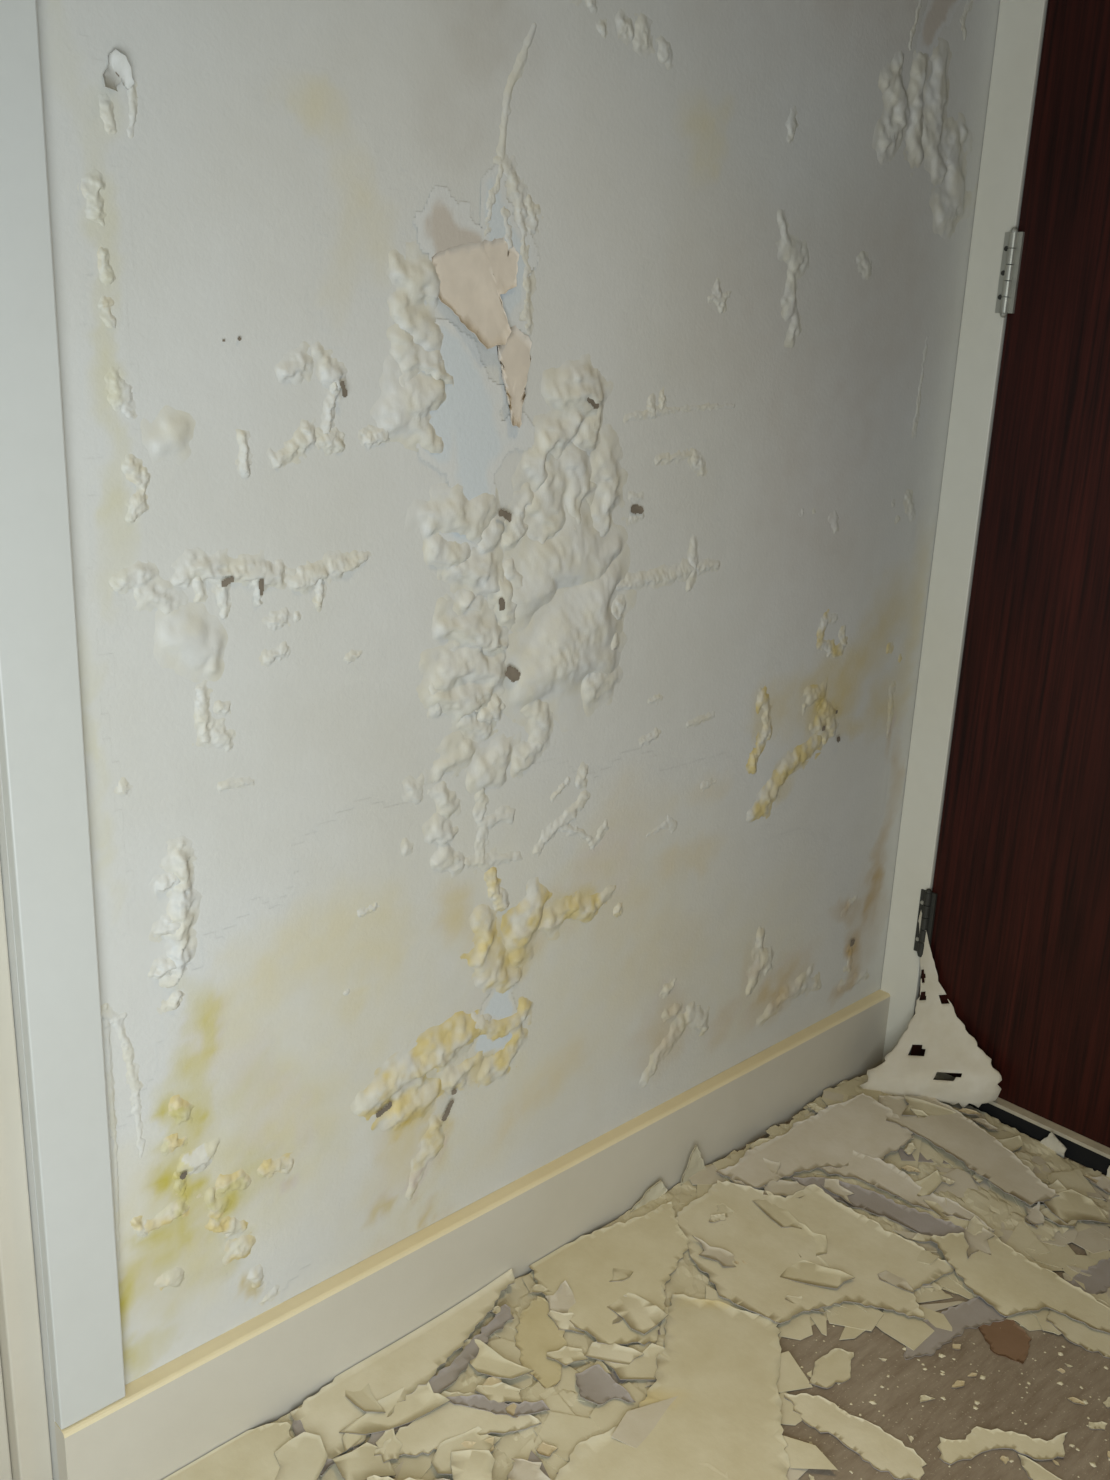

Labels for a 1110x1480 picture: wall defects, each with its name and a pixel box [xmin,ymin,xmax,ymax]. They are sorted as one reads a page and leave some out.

flaking render [413,153,543,500]
leakage [109,0,969,1384]